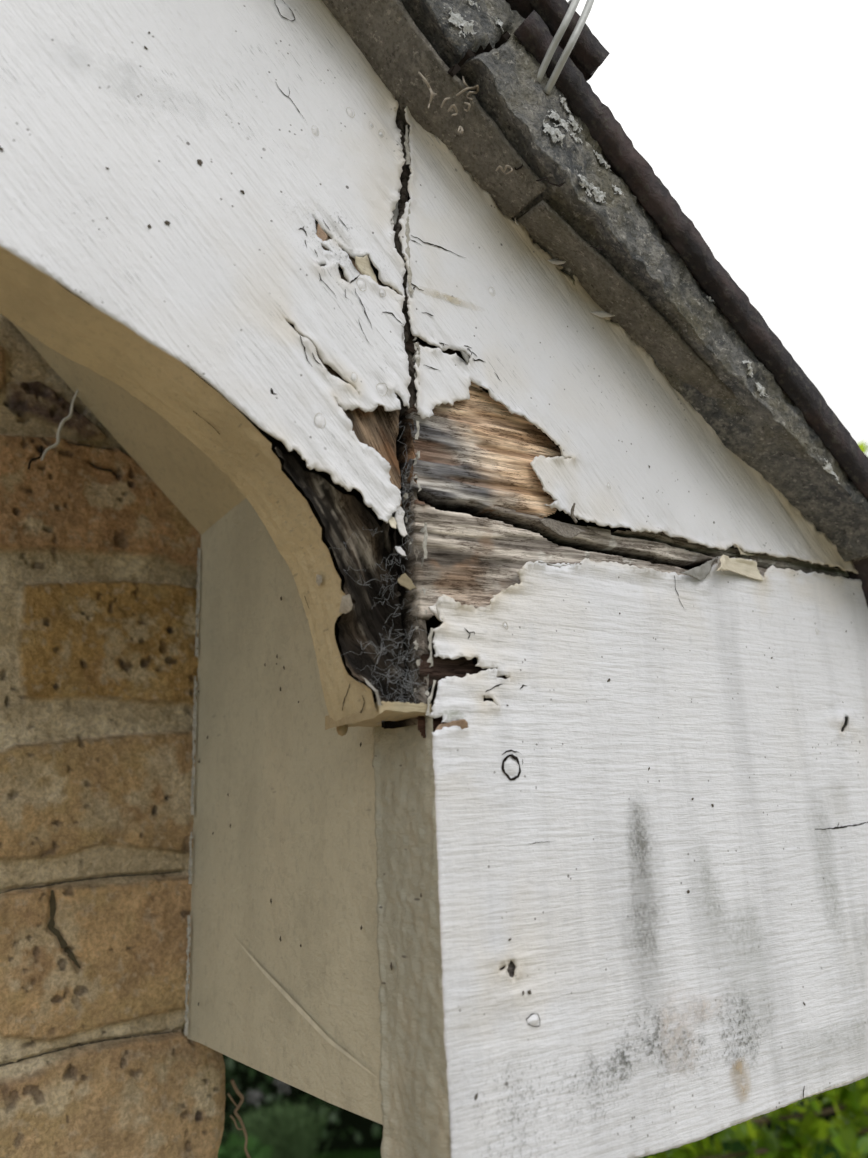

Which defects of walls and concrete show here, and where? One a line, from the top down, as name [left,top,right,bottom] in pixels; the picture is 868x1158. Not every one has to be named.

crack [289,324,345,382]
crack [298,121,502,729]
peeling [338,382,849,623]
peeling [419,653,507,686]
peeling [417,716,468,738]
crack [1,872,175,969]
damp [723,999,758,1059]